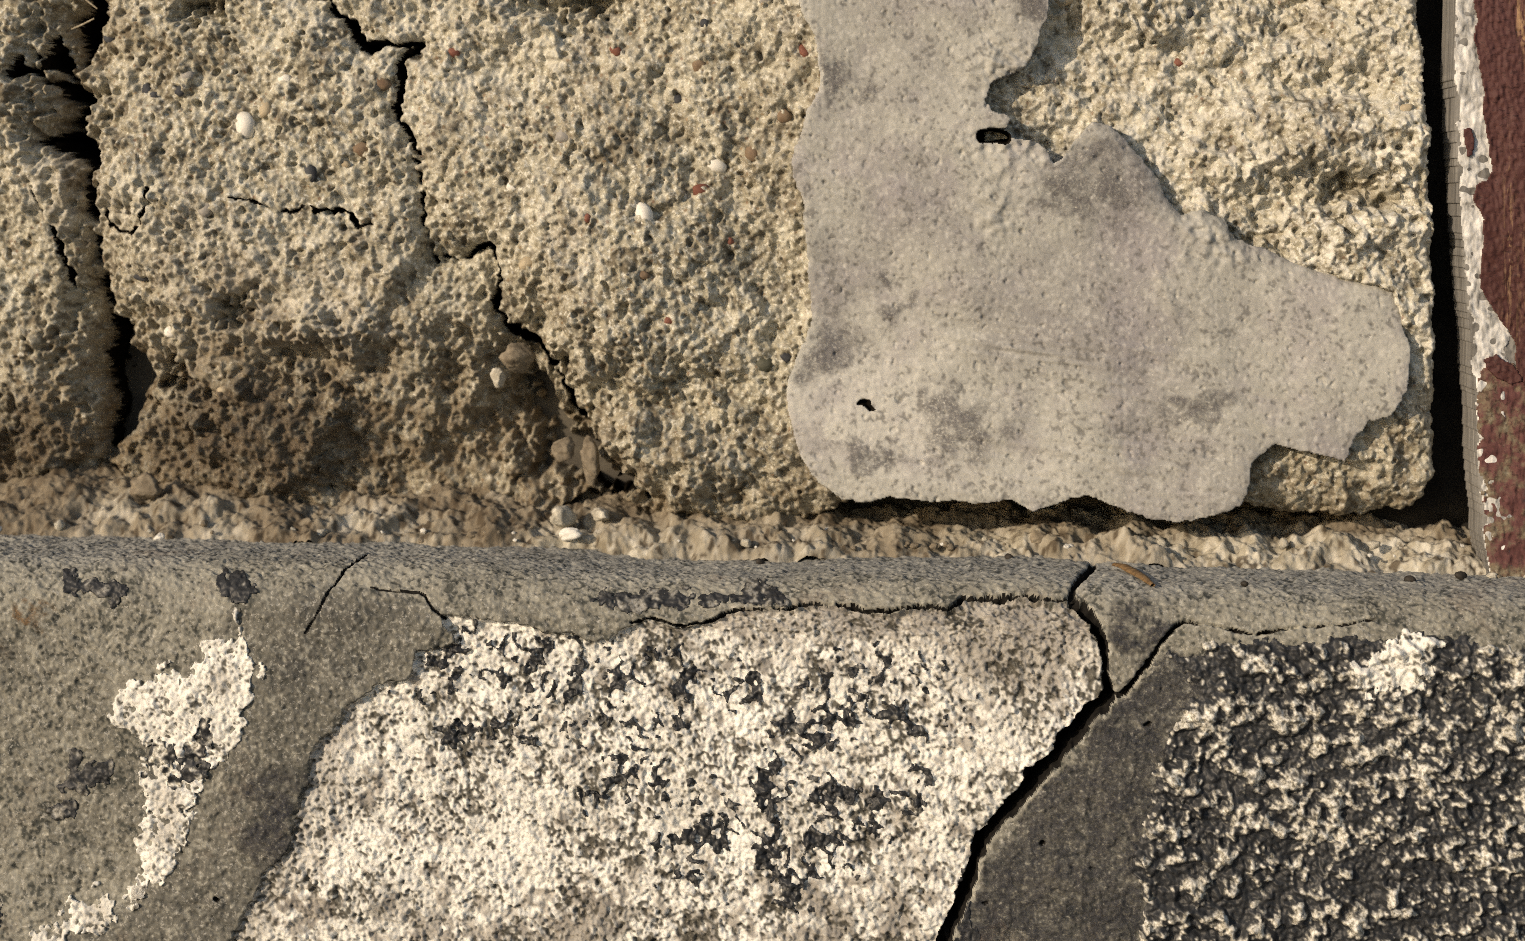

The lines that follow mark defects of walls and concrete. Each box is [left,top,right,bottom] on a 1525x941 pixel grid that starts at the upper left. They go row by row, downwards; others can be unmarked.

crack [5,0,149,449]
crack [227,197,374,229]
crack [324,0,650,500]
peeling [1463,0,1525,577]
peeling [46,747,115,821]
peeling [122,718,230,911]
peeling [216,567,258,636]
crack [304,554,447,634]
spalling [233,578,1104,941]
crack [630,564,1373,941]